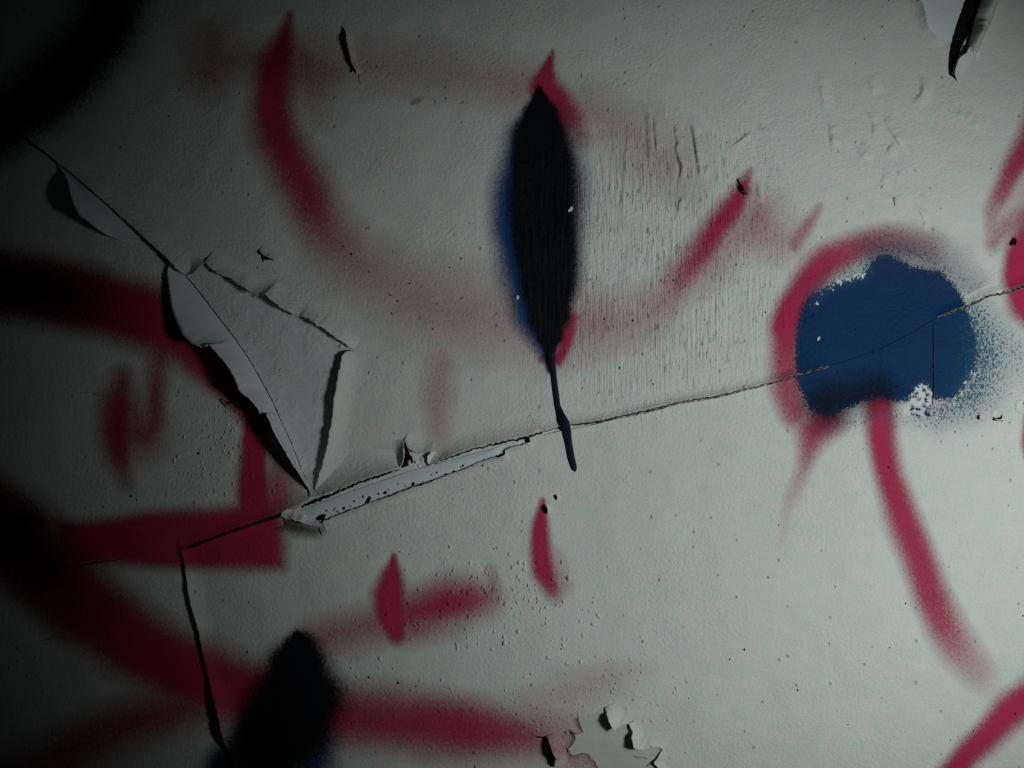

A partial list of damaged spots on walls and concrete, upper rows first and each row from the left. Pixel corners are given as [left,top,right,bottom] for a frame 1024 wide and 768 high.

peeling [907,0,999,83]
peeling [0,94,543,535]
crack [539,275,1024,441]
crack [175,486,310,768]
peeling [536,702,672,768]